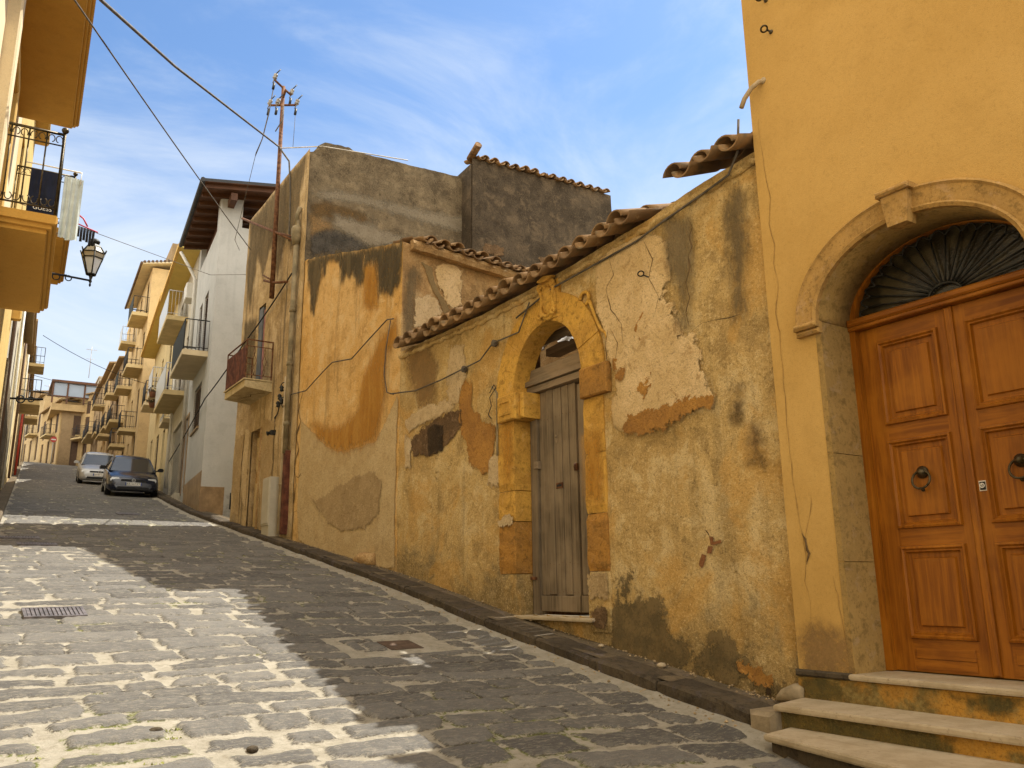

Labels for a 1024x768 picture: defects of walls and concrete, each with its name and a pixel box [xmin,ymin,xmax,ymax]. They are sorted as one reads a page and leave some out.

leakage [243,320,256,378]
leakage [247,156,417,331]
peeling [297,344,499,568]
flaking render [594,231,718,437]
leakage [724,188,748,313]
crack [758,121,850,660]
leakage [609,569,853,699]
leakage [967,696,1019,715]